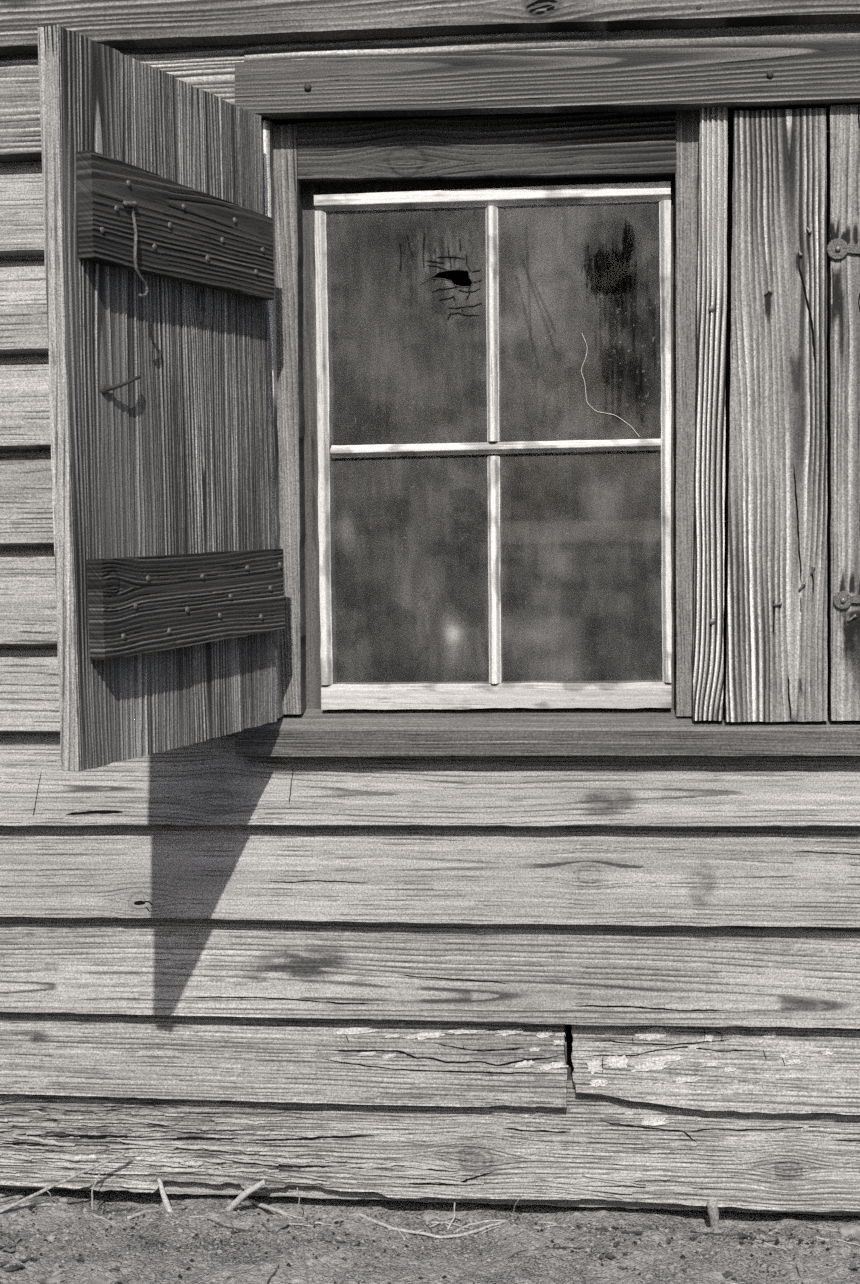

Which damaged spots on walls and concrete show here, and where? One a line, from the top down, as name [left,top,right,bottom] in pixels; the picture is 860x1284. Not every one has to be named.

crack [581,334,639,436]
crack [400,974,509,984]
crack [194,996,785,1074]
crack [503,1126,568,1134]
crack [0,1135,373,1169]
crack [408,1171,494,1185]